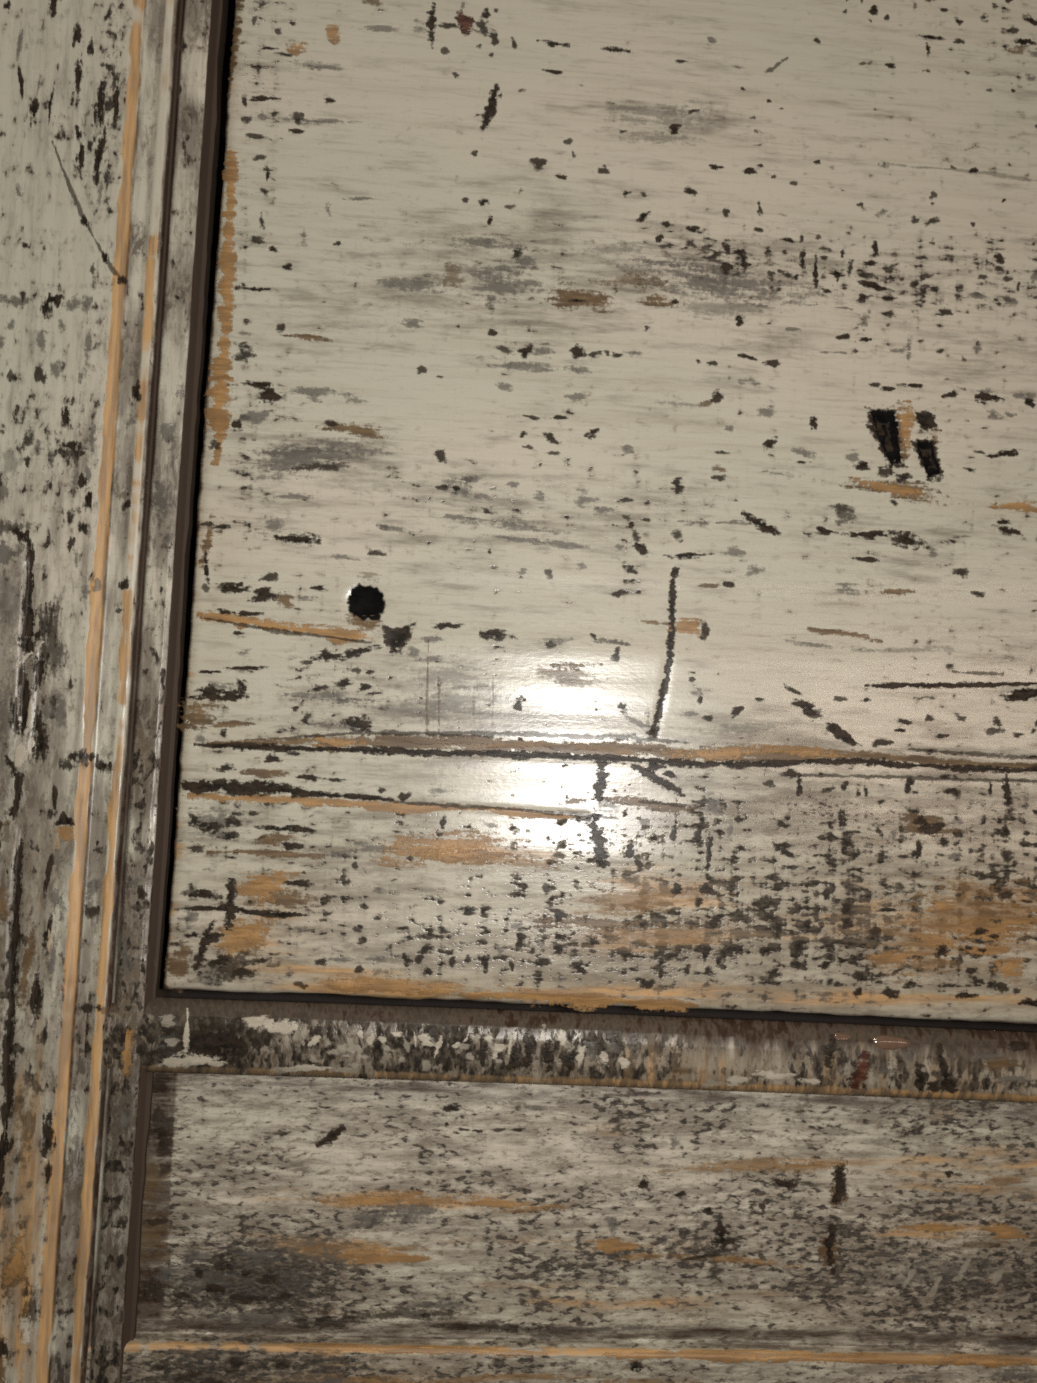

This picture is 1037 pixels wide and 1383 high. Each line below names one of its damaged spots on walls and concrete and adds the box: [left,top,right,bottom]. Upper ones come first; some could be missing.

spalling [623,191,702,247]
spalling [768,234,918,354]
spalling [21,406,96,489]
spalling [67,468,92,564]
spalling [816,383,946,562]
spalling [216,752,345,782]
peeling [17,785,75,1020]
peeling [294,762,735,1012]
peeling [795,774,1037,1007]
spalling [356,1024,638,1075]
spalling [40,1112,57,1183]
spalling [773,1157,849,1275]